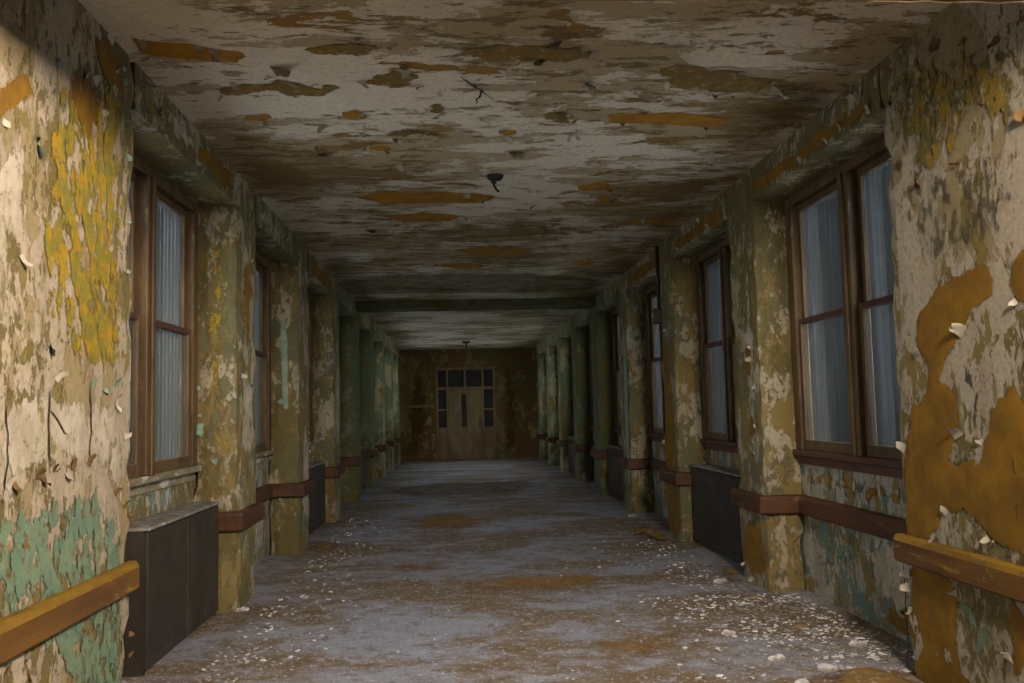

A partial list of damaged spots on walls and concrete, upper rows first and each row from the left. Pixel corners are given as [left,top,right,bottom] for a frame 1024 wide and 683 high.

peeling [304,39,400,57]
peeling [217,68,339,101]
peeling [356,66,425,90]
peeling [660,63,789,100]
peeling [598,112,728,130]
peeling [358,191,494,222]
peeling [1008,249,1024,306]
peeling [0,32,246,618]
peeling [197,228,256,453]
peeling [810,264,1024,555]
peeling [864,538,1024,683]
peeling [24,600,135,683]